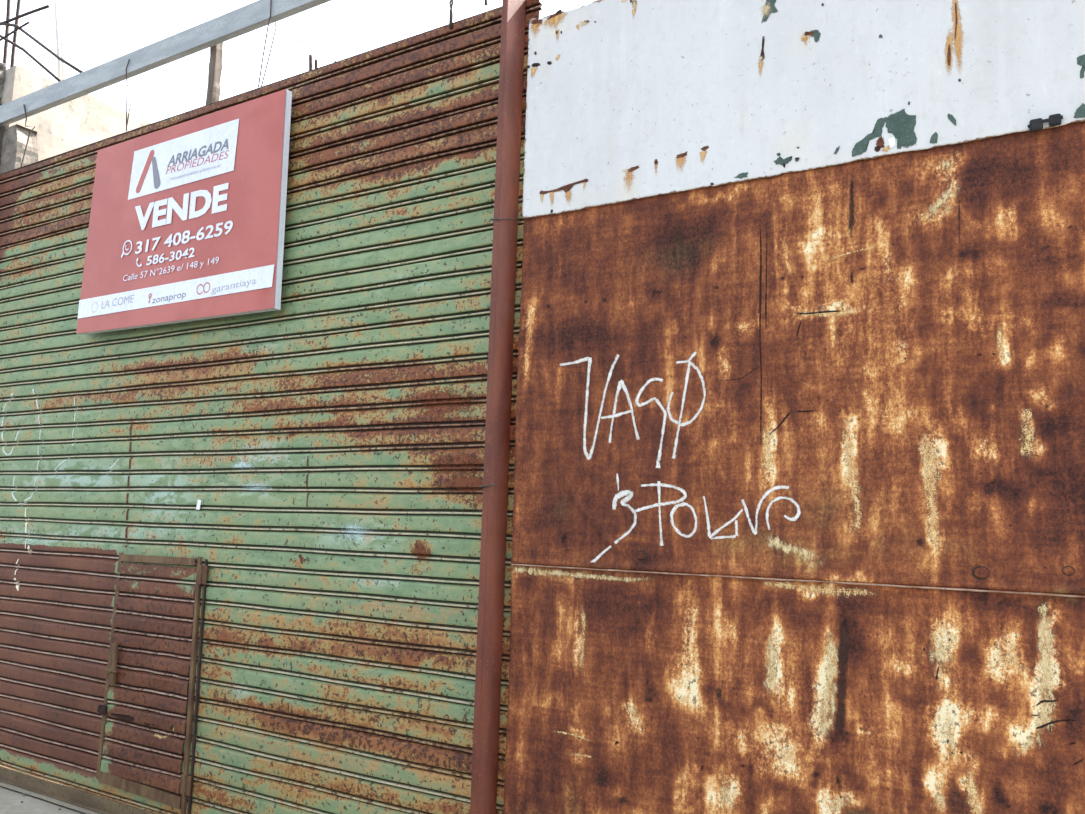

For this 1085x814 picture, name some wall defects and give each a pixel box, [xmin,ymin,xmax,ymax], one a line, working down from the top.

corrosion [531,9,566,39]
peeling [761,0,778,23]
corrosion [945,0,963,82]
peeling [834,102,917,157]
corrosion [676,146,709,167]
corrosion [623,165,640,187]
corrosion [539,179,588,213]
corrosion [405,383,484,429]
corrosion [417,451,484,518]